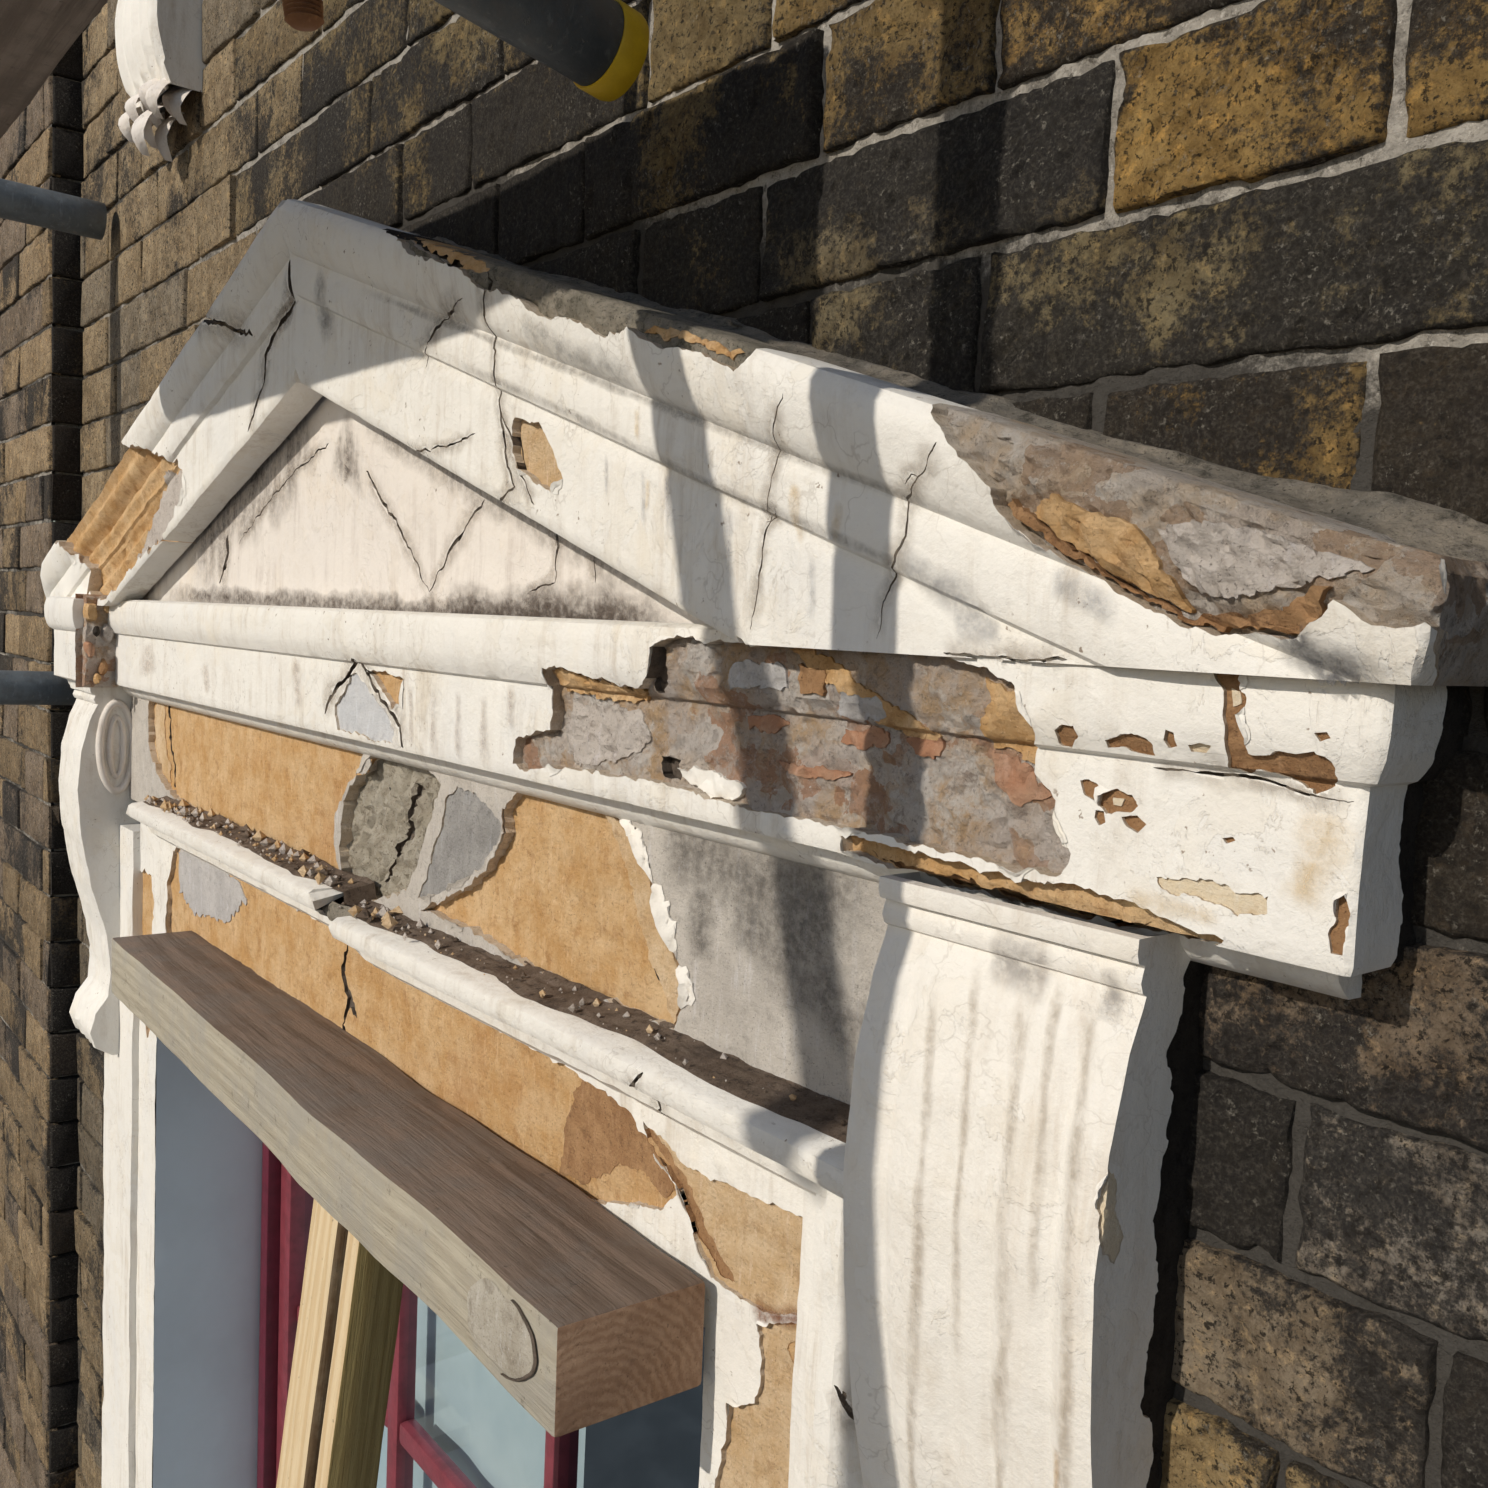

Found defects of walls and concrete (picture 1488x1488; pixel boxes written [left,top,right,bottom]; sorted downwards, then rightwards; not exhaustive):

spalling [55,442,191,688]
crack [204,261,296,431]
crack [341,945,357,1030]
spalling [148,670,695,1029]
crack [366,272,534,592]
crack [530,534,560,592]
crack [750,394,783,629]
spalling [513,635,1224,945]
crack [876,443,936,639]
spalling [931,403,1488,963]
spalling [142,847,803,1488]
peeling [1140,961,1204,1488]